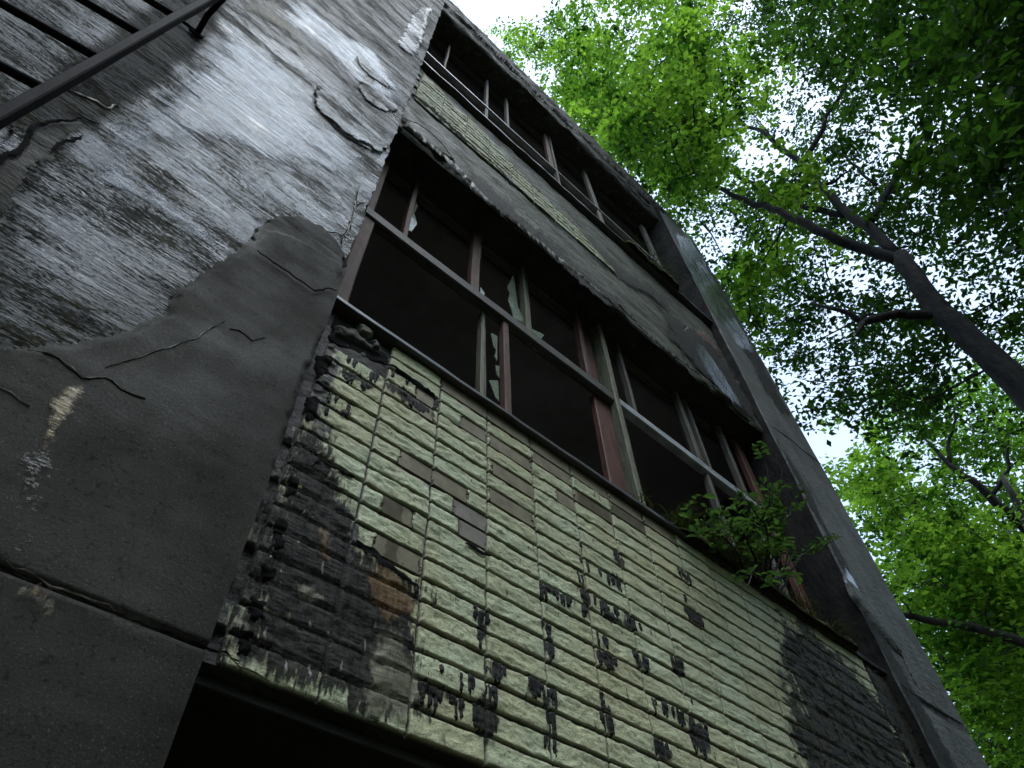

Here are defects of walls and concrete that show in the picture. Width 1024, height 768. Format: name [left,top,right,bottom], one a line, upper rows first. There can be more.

damp [265,1,401,121]
spalling [398,4,433,57]
damp [92,35,362,251]
peeling [250,215,347,292]
spalling [356,55,729,399]
crack [27,321,265,399]
spalling [302,396,320,422]
spalling [314,316,388,379]
peeling [416,380,676,544]
peeling [373,534,420,575]
crack [0,561,270,682]
damp [771,605,958,768]